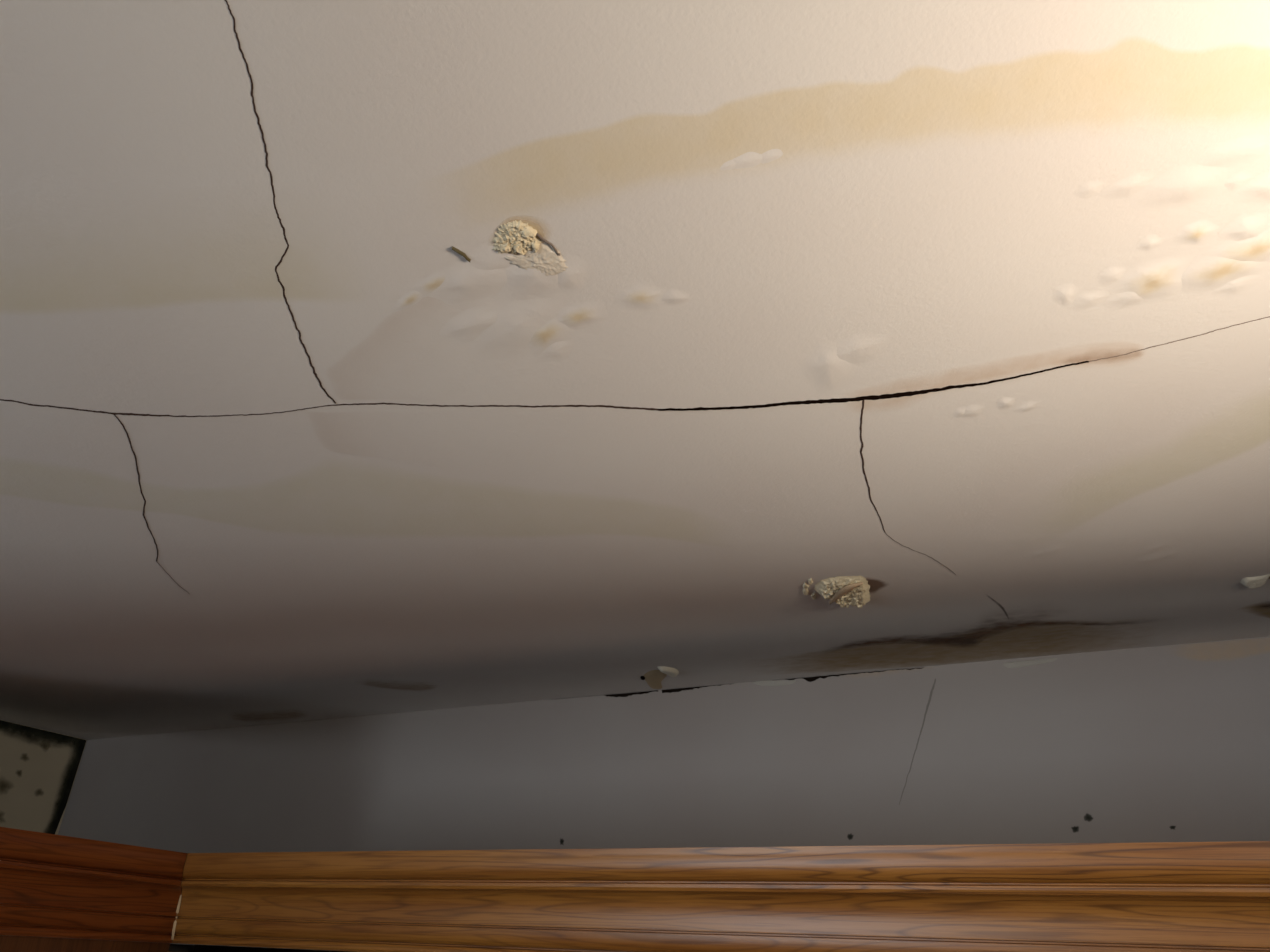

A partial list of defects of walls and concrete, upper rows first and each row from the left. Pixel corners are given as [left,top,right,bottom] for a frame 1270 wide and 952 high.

spalling [492,220,568,276]
crack [0,0,1270,592]
water stain [0,34,1270,565]
spalling [803,575,892,608]
peeling [1240,574,1270,589]
peeling [640,666,679,689]
water stain [706,599,1270,681]
mould [0,720,86,834]